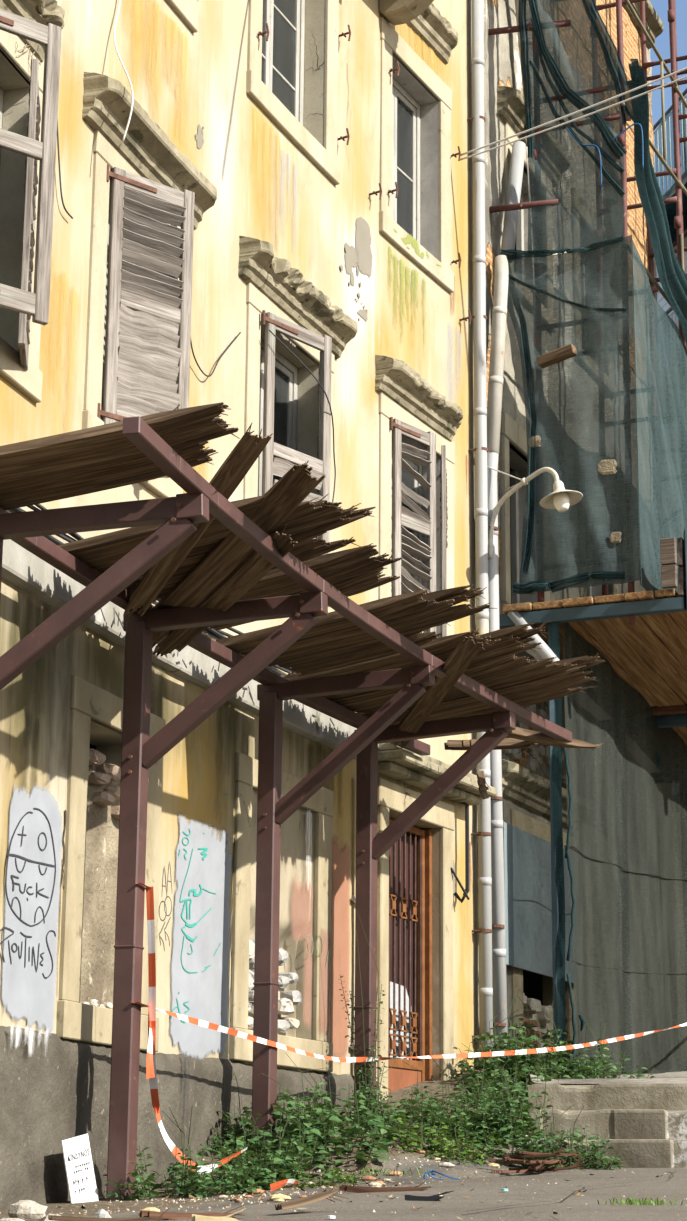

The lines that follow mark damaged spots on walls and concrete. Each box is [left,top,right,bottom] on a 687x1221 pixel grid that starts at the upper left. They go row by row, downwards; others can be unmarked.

peeling [340,217,373,321]
leakage [389,247,425,319]